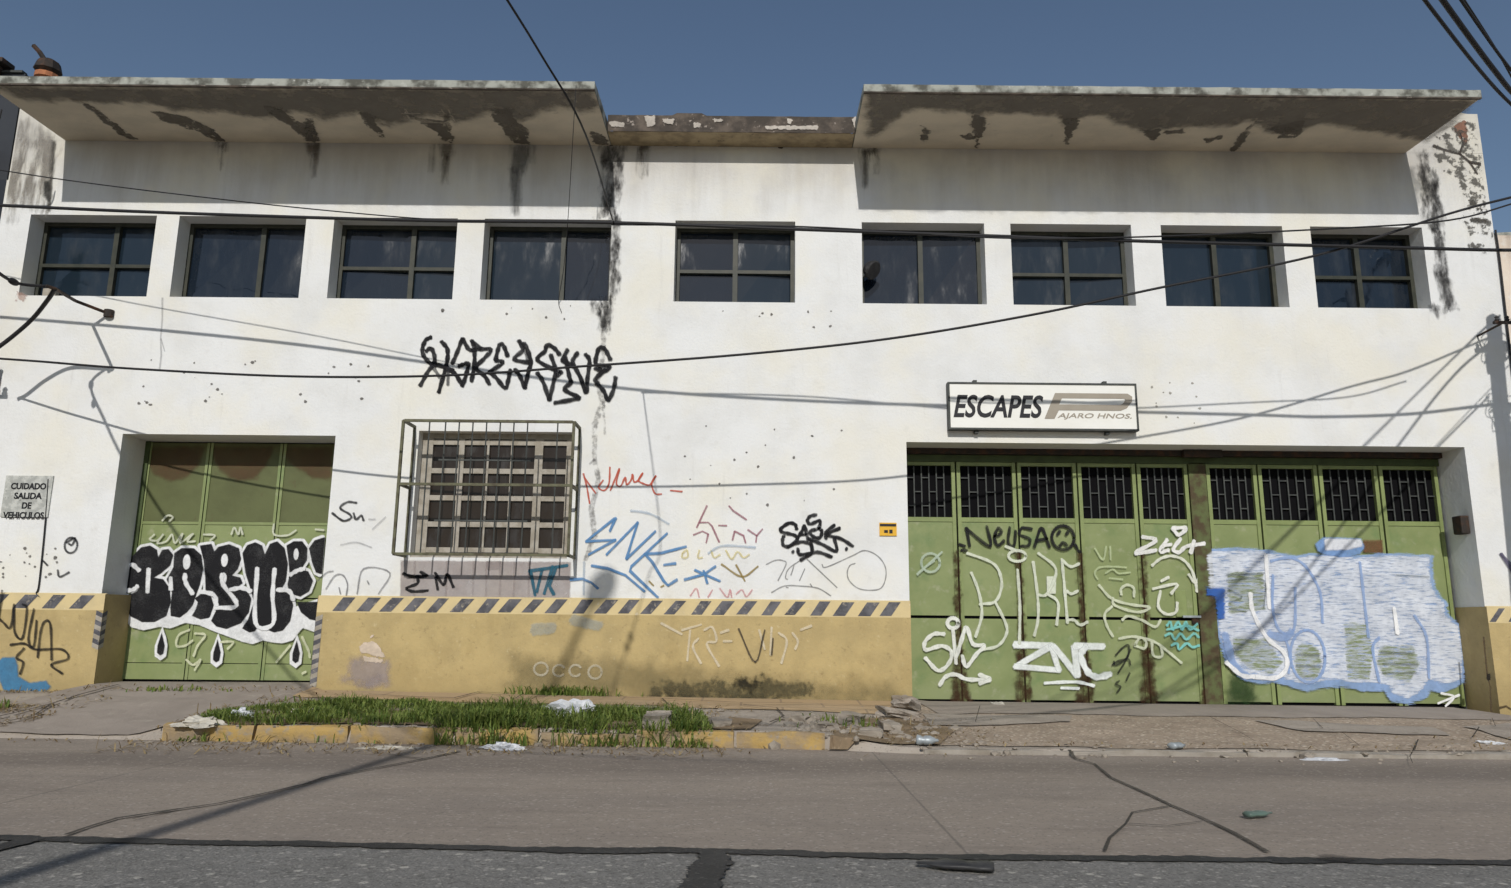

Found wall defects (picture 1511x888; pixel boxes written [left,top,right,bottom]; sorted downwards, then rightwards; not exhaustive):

peeling [590,121,624,146]
peeling [644,115,675,127]
peeling [765,118,818,149]
water stain [1419,121,1493,315]
water stain [591,146,644,330]